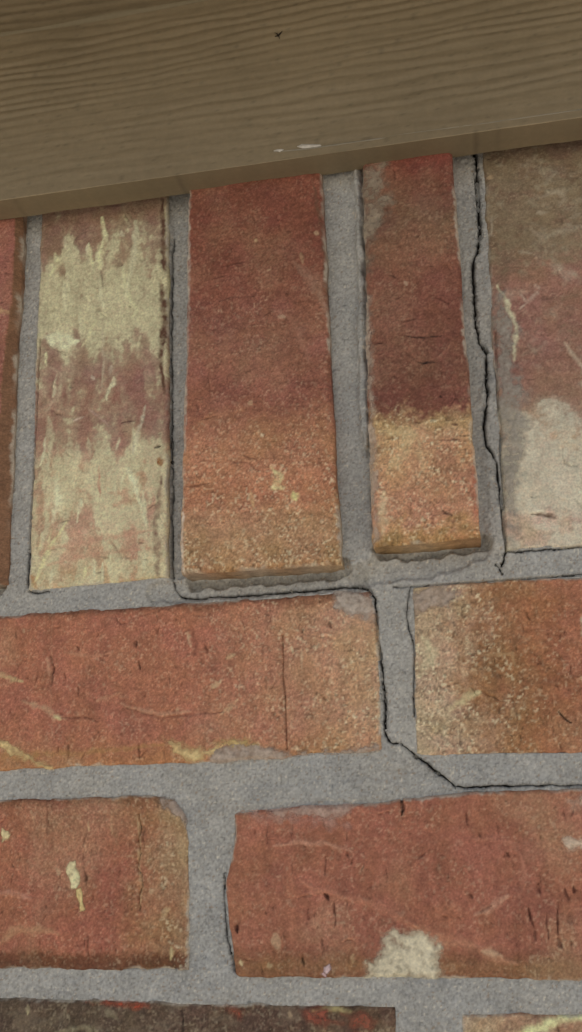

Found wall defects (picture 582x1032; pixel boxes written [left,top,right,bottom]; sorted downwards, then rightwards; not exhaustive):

crack [169,239,582,792]
crack [468,154,582,580]